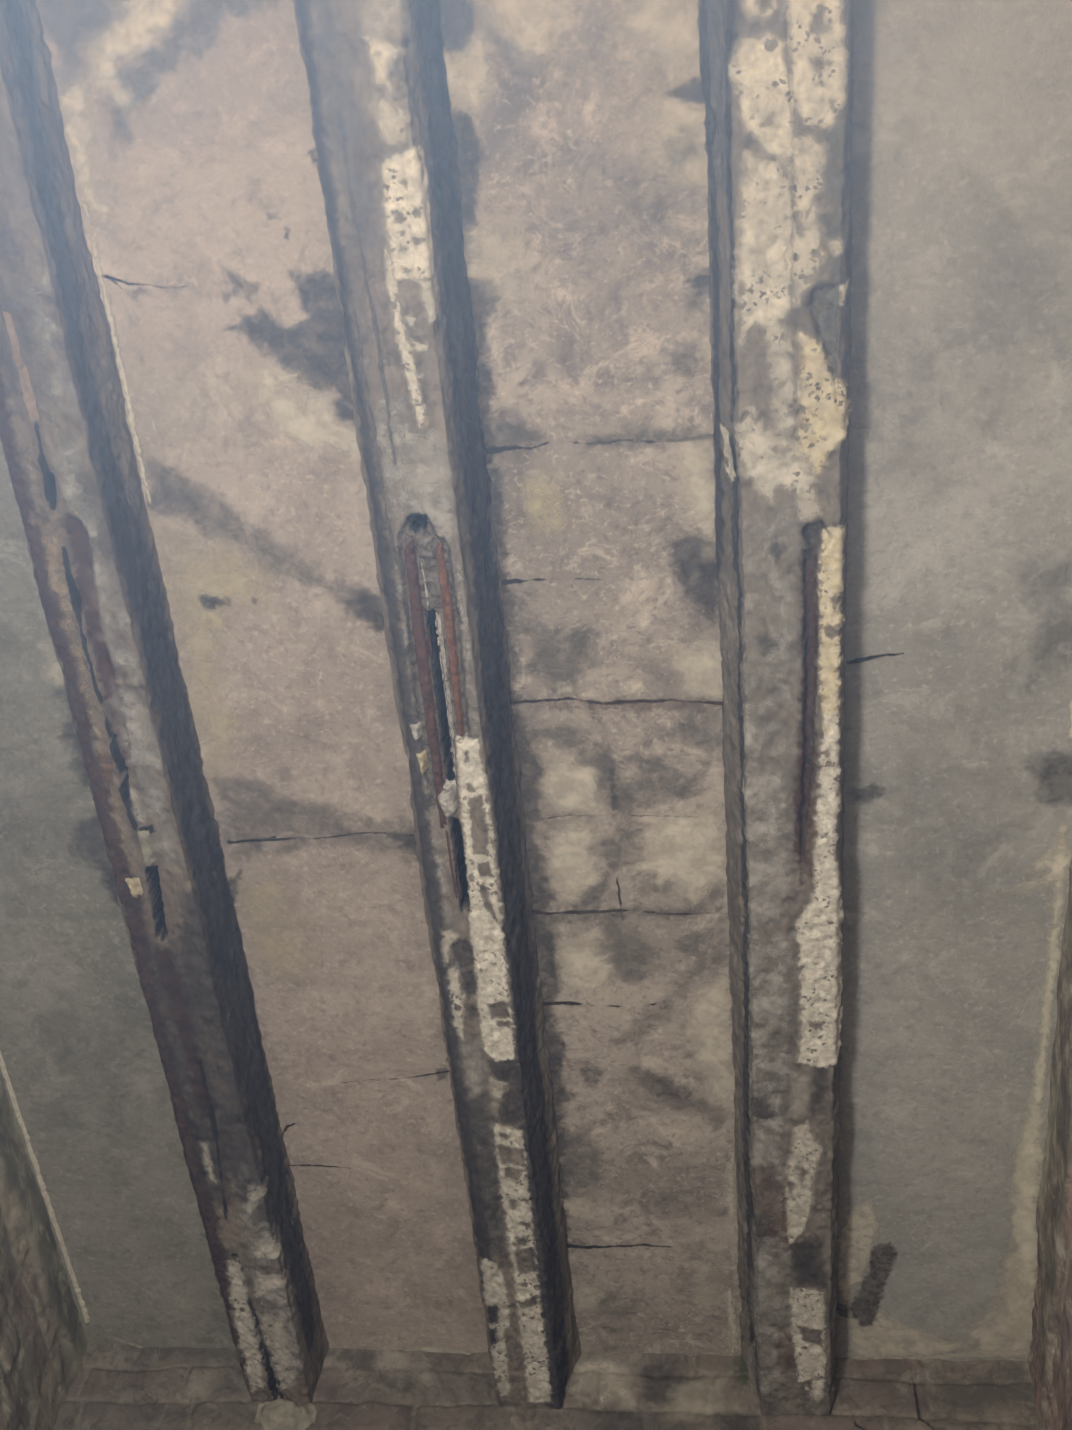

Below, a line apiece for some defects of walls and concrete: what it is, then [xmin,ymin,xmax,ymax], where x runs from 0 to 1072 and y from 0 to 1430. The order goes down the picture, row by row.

rust [0,375,251,1383]
crack [96,275,189,297]
leakage [39,0,247,213]
leakage [228,271,472,660]
peeling [364,35,439,428]
spalling [398,513,515,1062]
leakage [439,0,727,1255]
crack [532,880,691,916]
crack [510,697,723,705]
peeling [720,0,849,515]
rust [793,520,826,884]
peeling [795,525,846,1068]